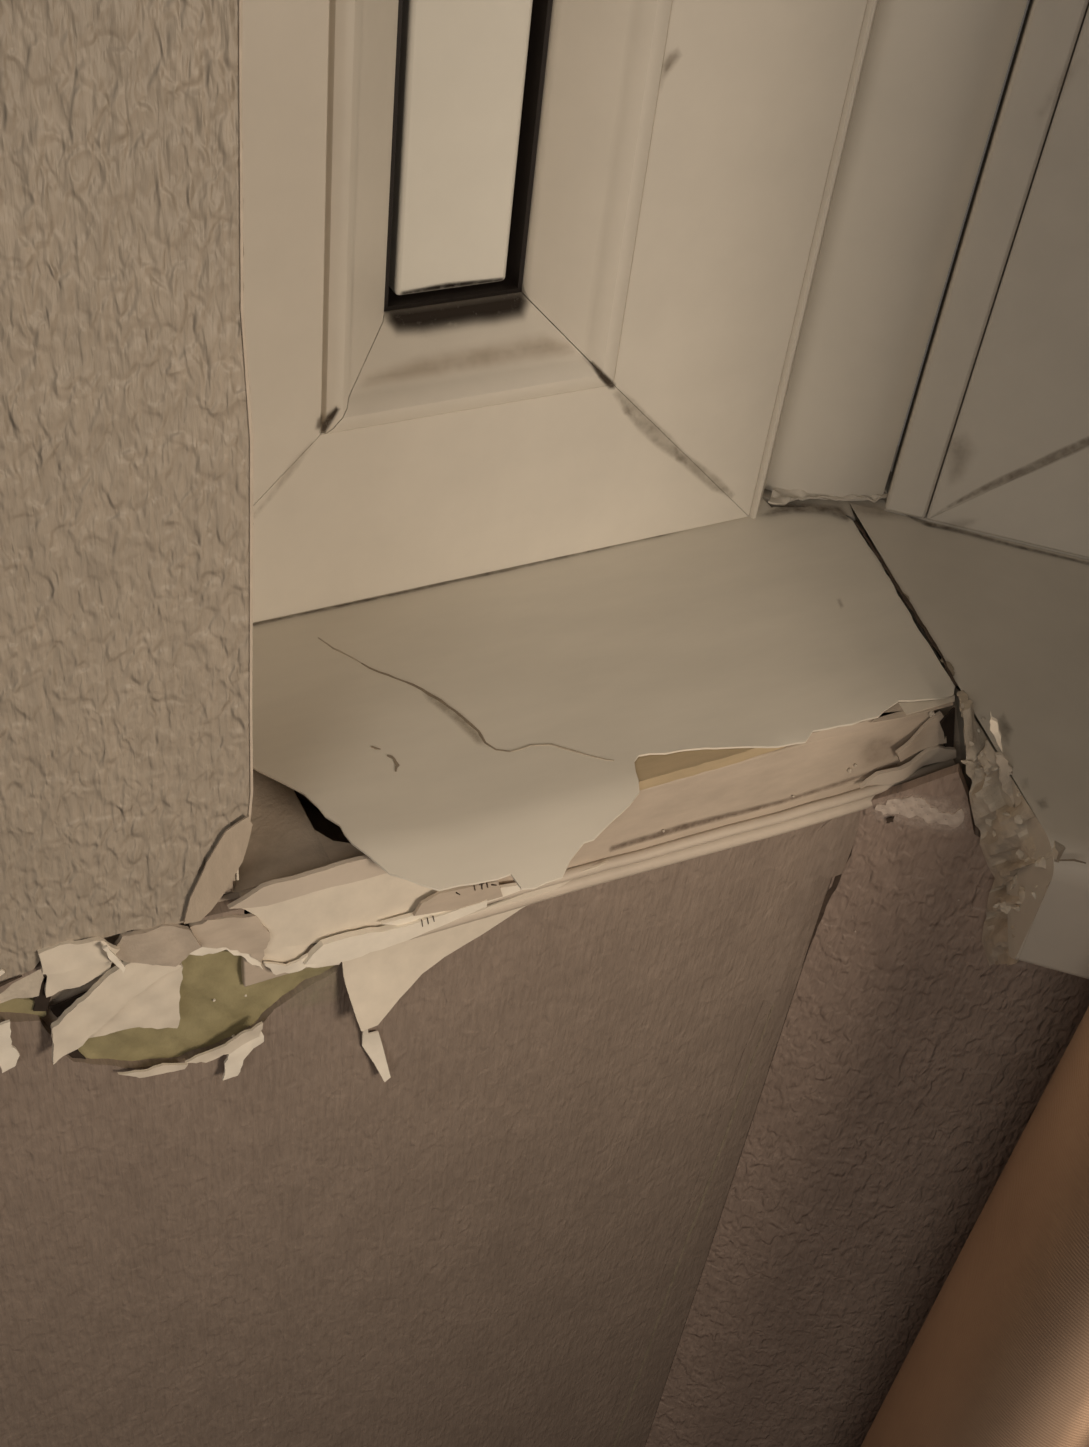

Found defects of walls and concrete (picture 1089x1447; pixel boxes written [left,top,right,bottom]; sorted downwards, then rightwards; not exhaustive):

crack [854,520,957,686]
crack [371,746,400,772]
crack [318,637,614,761]
spalling [871,690,1065,966]
spalling [0,913,341,1080]